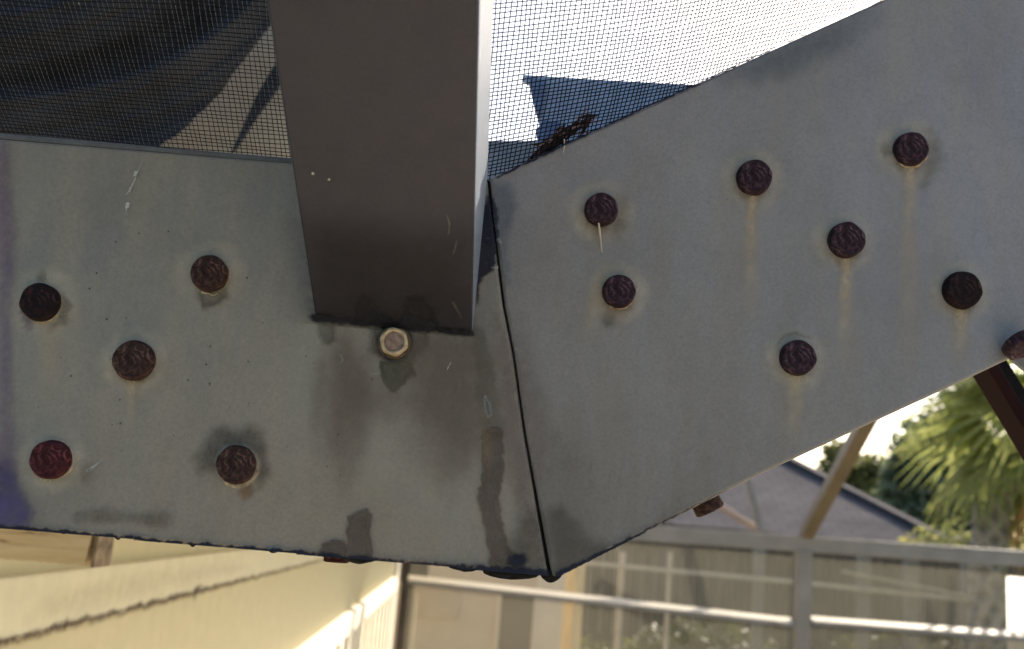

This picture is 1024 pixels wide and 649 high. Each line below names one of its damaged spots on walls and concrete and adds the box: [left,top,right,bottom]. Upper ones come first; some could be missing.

leakage [372,329,428,393]
leakage [478,427,544,570]
leakage [0,509,372,646]